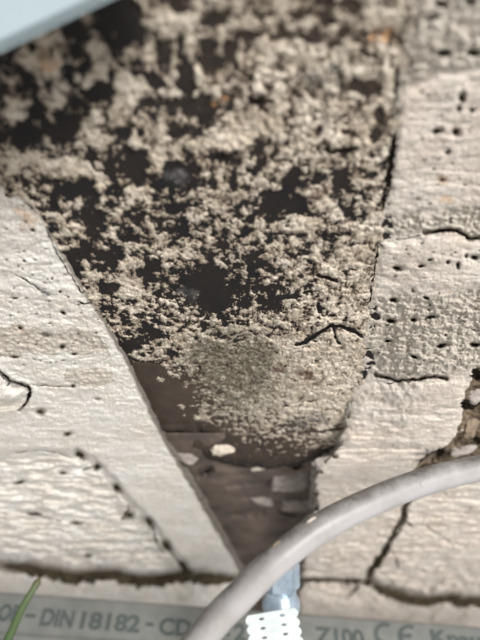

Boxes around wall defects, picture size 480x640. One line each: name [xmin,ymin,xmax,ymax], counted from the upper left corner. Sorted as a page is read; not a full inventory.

crack [403,228,480,240]
peeling [76,239,110,267]
peeling [152,258,196,284]
spalling [0,326,110,358]
crack [298,325,360,345]
spalling [0,375,27,407]
crack [0,371,72,408]
crack [382,375,444,384]
spalling [362,285,480,470]
peeling [130,360,344,467]
crack [1,526,235,590]
crack [303,503,480,609]